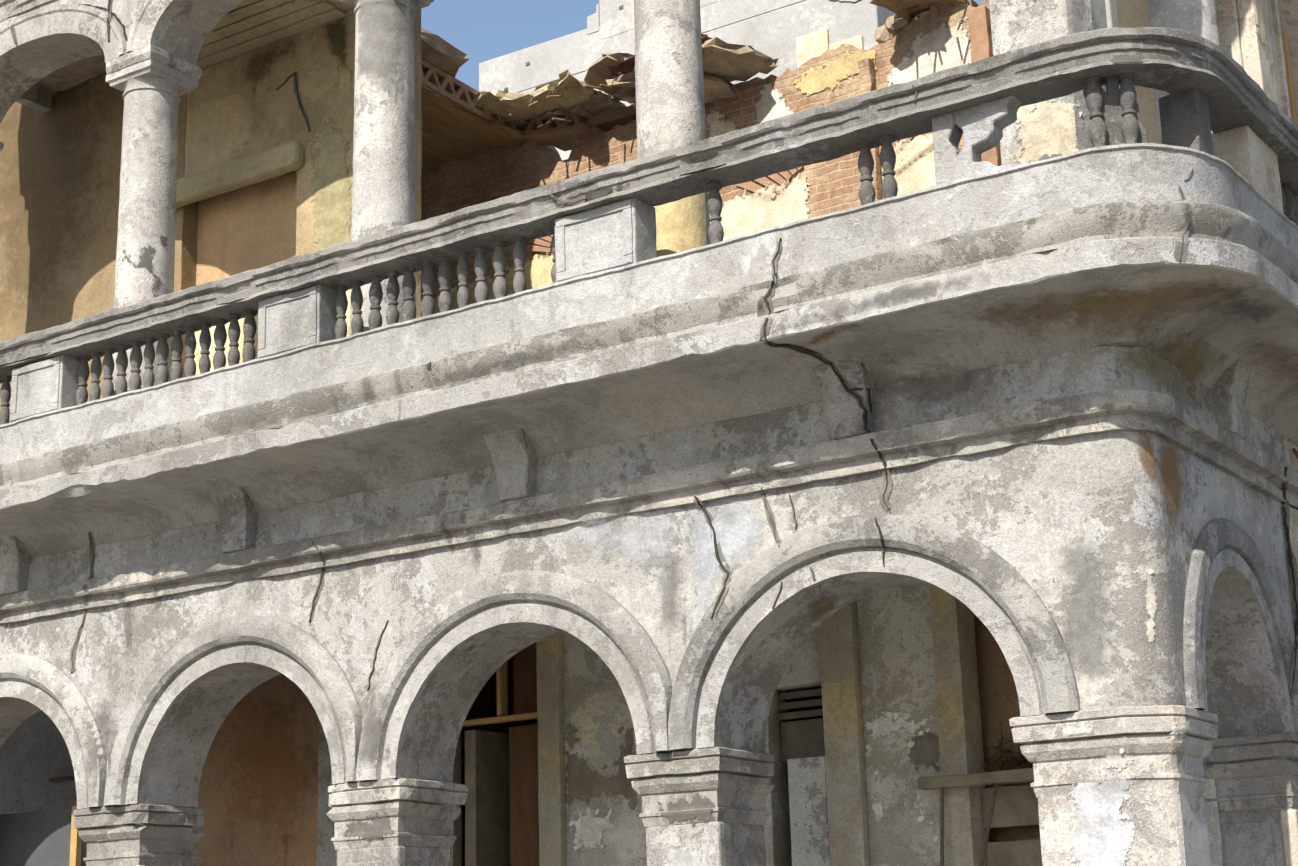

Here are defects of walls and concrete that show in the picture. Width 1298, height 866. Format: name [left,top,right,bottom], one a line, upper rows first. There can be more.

crack [78,0,127,43]
peeling [706,16,971,138]
spalling [122,235,168,297]
crack [759,238,893,567]
crack [70,532,94,674]
crack [309,541,325,623]
crack [367,620,389,691]
crack [692,496,731,619]
crack [772,567,821,609]
crack [1280,467,1298,696]
peeling [564,724,639,855]
peeling [863,710,940,775]